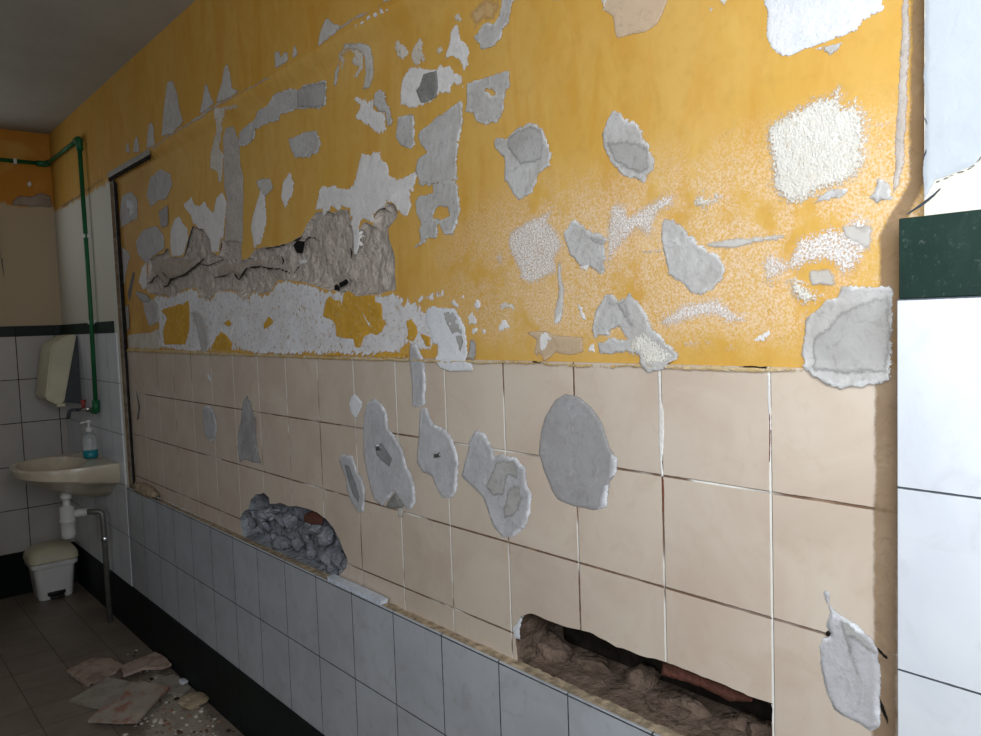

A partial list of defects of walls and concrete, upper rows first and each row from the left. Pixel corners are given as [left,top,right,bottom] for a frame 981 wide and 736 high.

peeling [126,104,803,372]
spalling [240,493,347,576]
spalling [513,614,773,736]